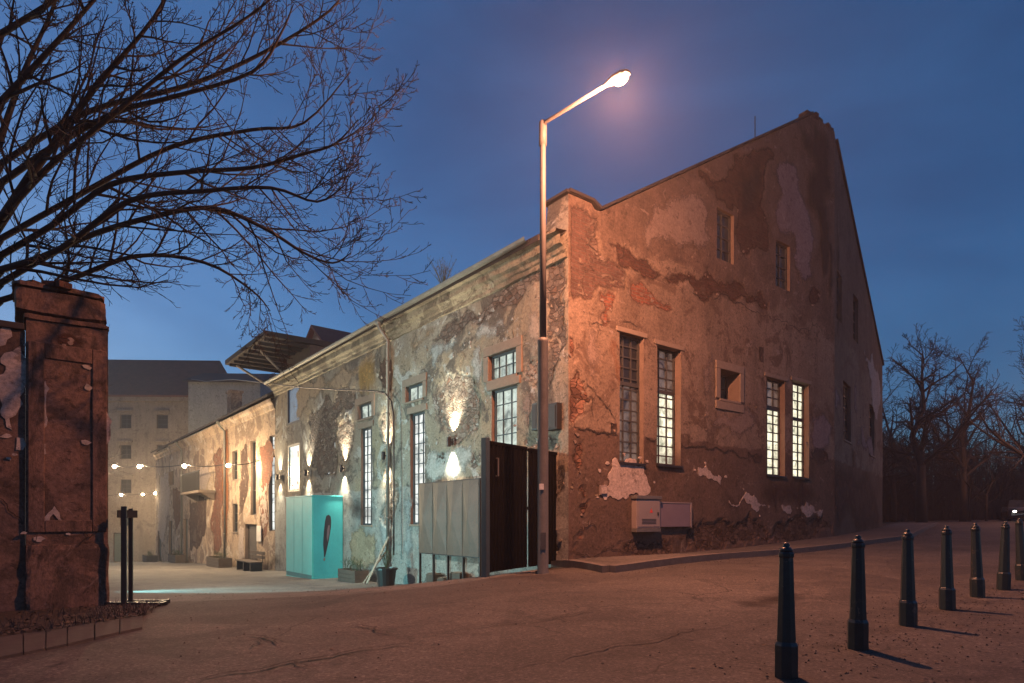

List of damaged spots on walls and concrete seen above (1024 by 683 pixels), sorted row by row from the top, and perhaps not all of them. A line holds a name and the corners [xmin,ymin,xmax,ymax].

flaking render [0,327,26,460]
spalling [294,353,395,479]
spalling [411,146,831,550]
spalling [158,448,223,554]